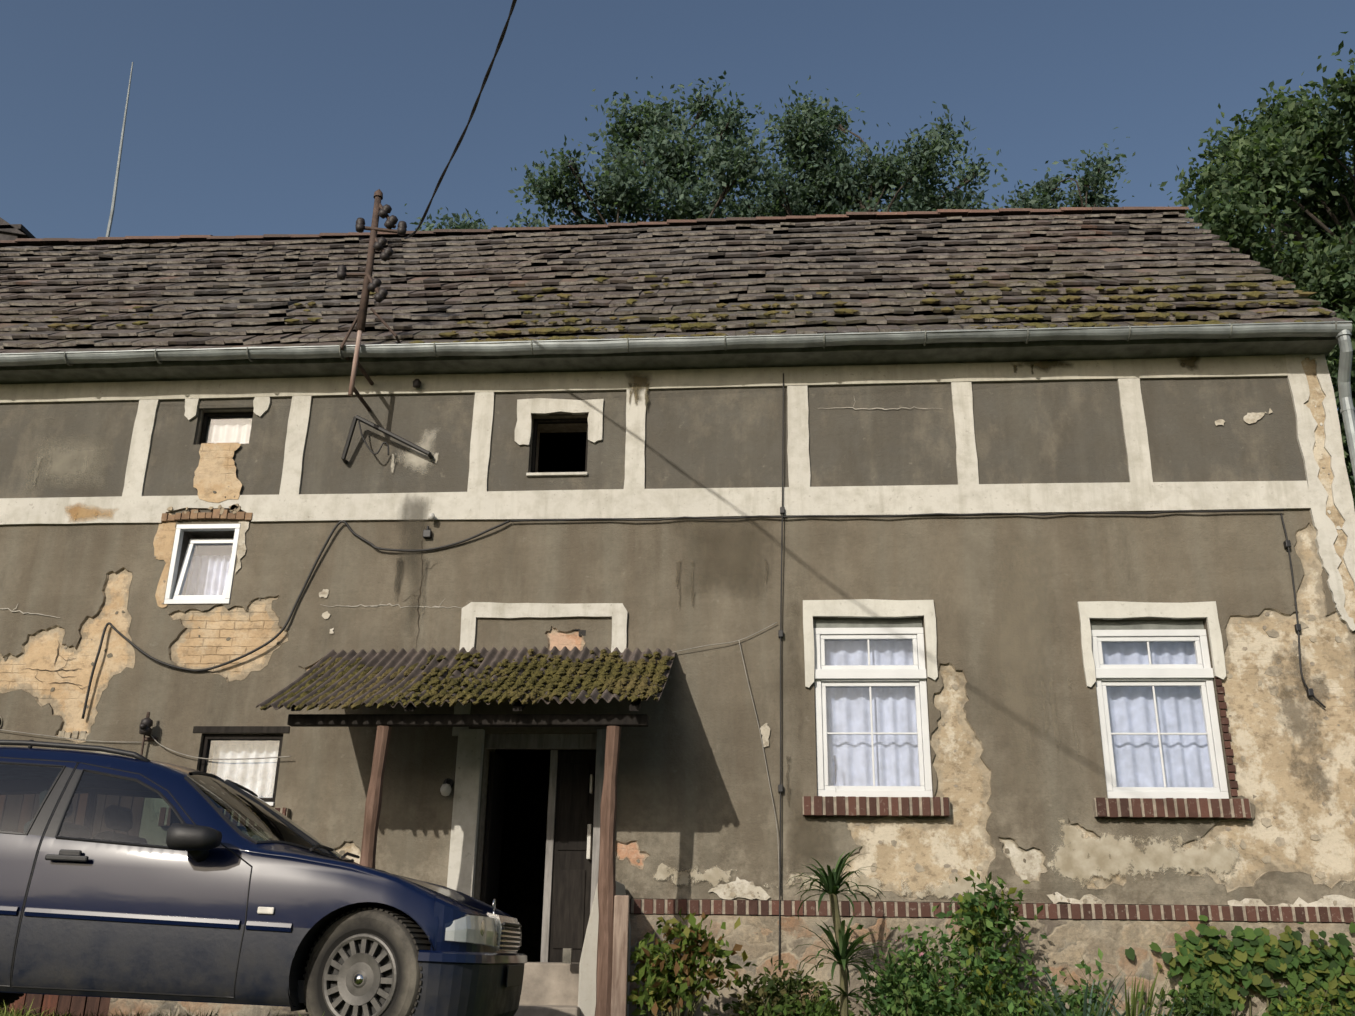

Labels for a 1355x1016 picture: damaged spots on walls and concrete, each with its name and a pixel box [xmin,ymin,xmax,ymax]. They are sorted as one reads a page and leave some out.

flaking render [153,443,289,682]
flaking render [0,567,135,744]
spalling [545,626,586,651]
flaking render [1181,358,1355,907]
flaking render [841,662,1049,901]
flaking render [334,840,361,864]
flaking render [615,840,650,870]
peeling [708,877,770,900]
flaking render [1047,855,1131,904]